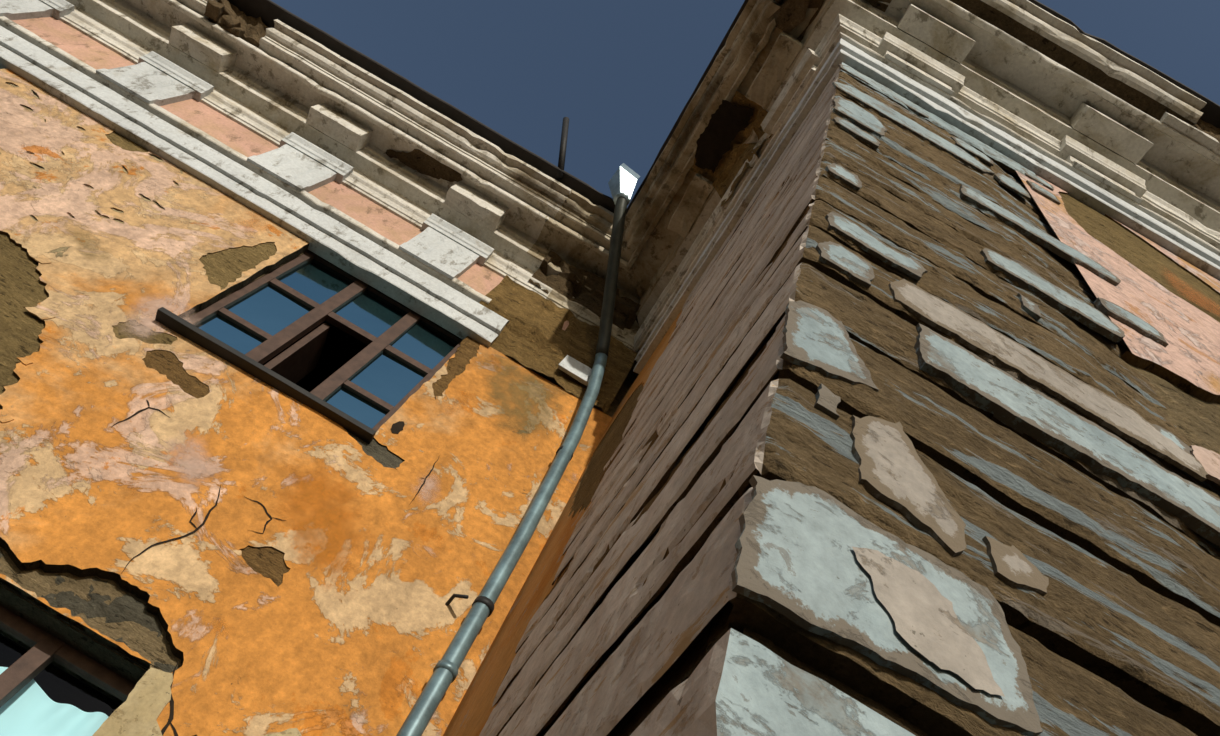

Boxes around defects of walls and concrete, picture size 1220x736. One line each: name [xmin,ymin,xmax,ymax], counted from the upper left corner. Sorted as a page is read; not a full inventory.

spalling [386,146,463,182]
spalling [690,91,773,207]
spalling [200,243,277,290]
spalling [0,234,55,423]
spalling [112,321,210,399]
spalling [811,64,1220,561]
crack [111,400,169,427]
crack [123,485,286,571]
spalling [241,546,290,587]
crack [409,455,440,505]
spalling [731,300,1220,736]
spalling [41,574,162,646]